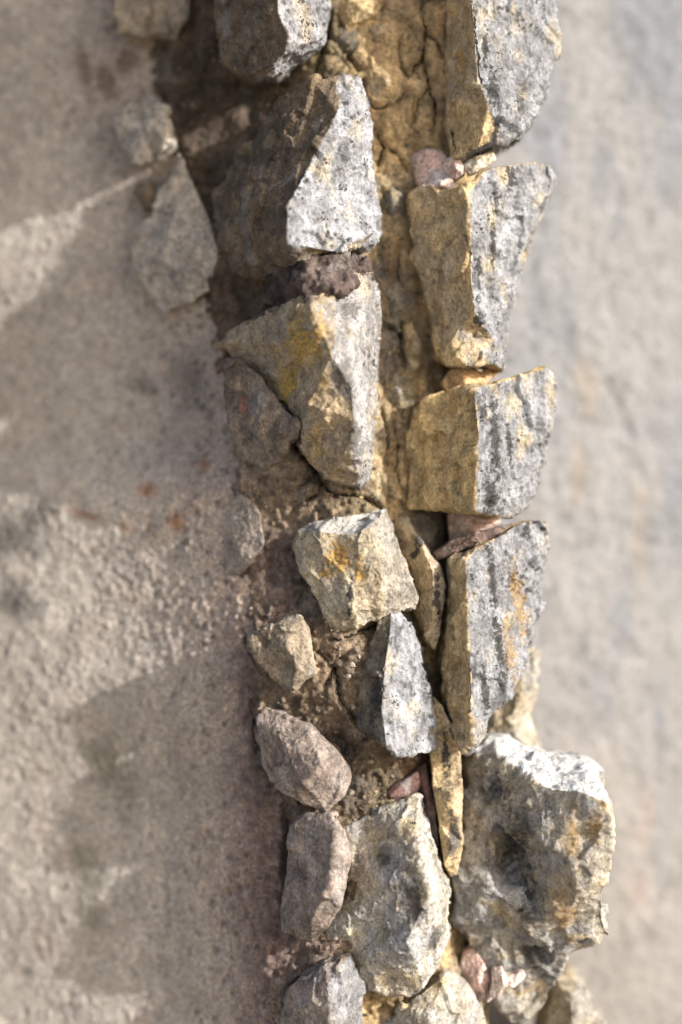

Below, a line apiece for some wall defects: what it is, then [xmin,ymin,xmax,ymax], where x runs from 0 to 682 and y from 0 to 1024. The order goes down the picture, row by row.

crack [314,17,406,170]
crack [398,10,457,154]
crack [471,0,483,84]
crack [382,321,404,366]
crack [293,443,378,508]
crack [381,412,402,489]
crack [321,624,377,719]